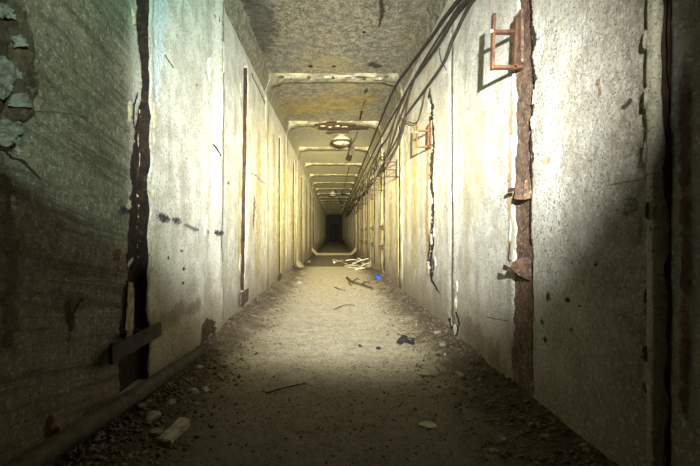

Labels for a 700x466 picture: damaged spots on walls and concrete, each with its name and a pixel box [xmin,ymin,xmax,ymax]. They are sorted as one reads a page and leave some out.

spalling [0,0,38,147]
spalling [119,0,167,338]
crack [425,89,439,292]
spalling [118,343,149,393]